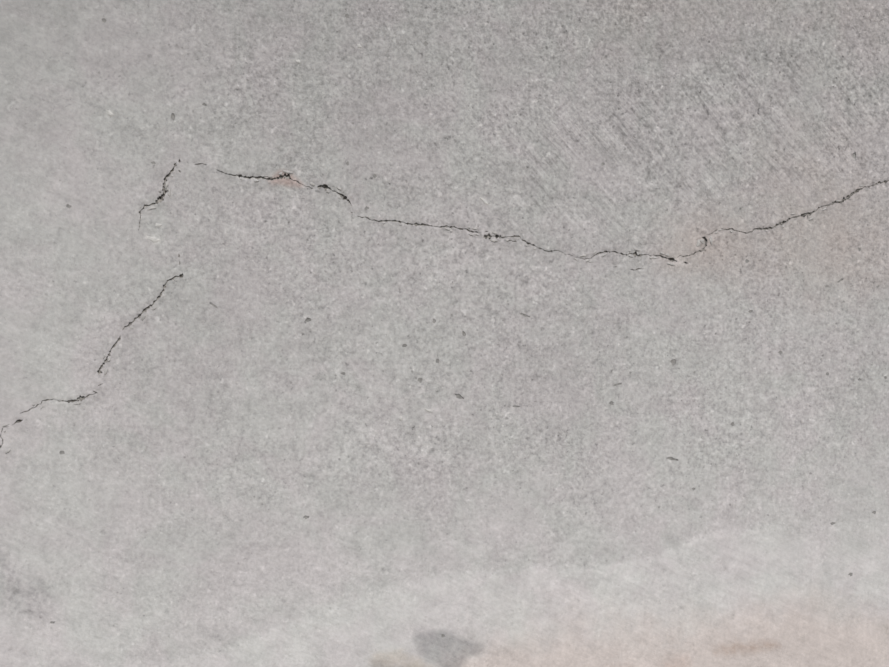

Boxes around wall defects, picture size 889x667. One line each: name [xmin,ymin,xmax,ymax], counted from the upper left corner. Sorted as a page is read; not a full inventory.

crack [138,159,889,270]
crack [0,254,183,453]